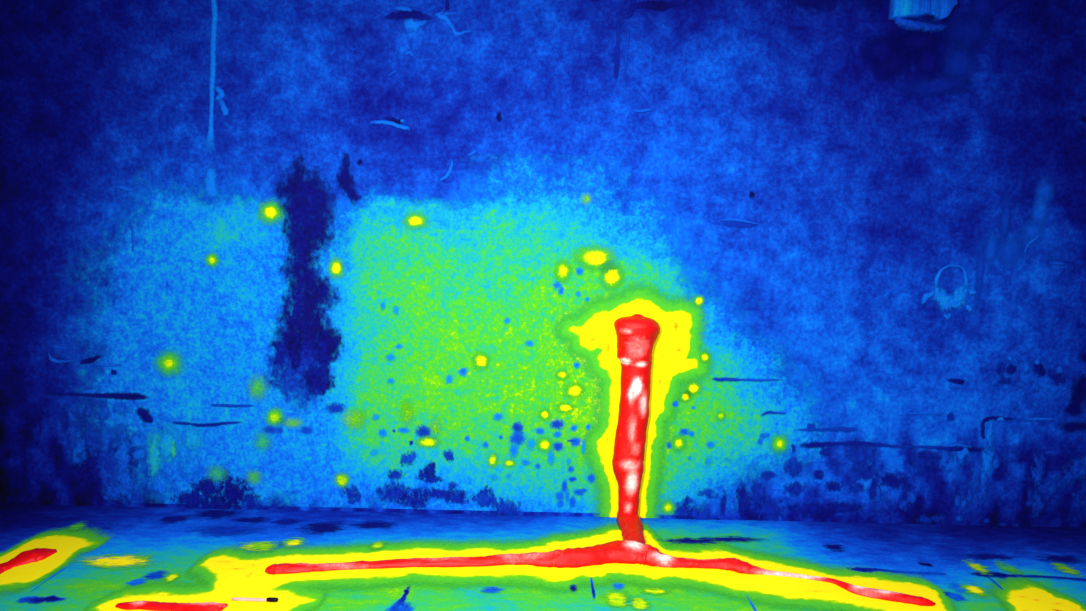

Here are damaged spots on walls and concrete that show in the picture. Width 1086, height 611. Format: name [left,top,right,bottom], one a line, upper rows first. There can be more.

damp [78,154,969,611]
damp [1036,554,1083,564]
crack [0,548,66,604]
crack [851,567,1086,590]
crack [115,601,228,611]
crack [386,586,414,611]